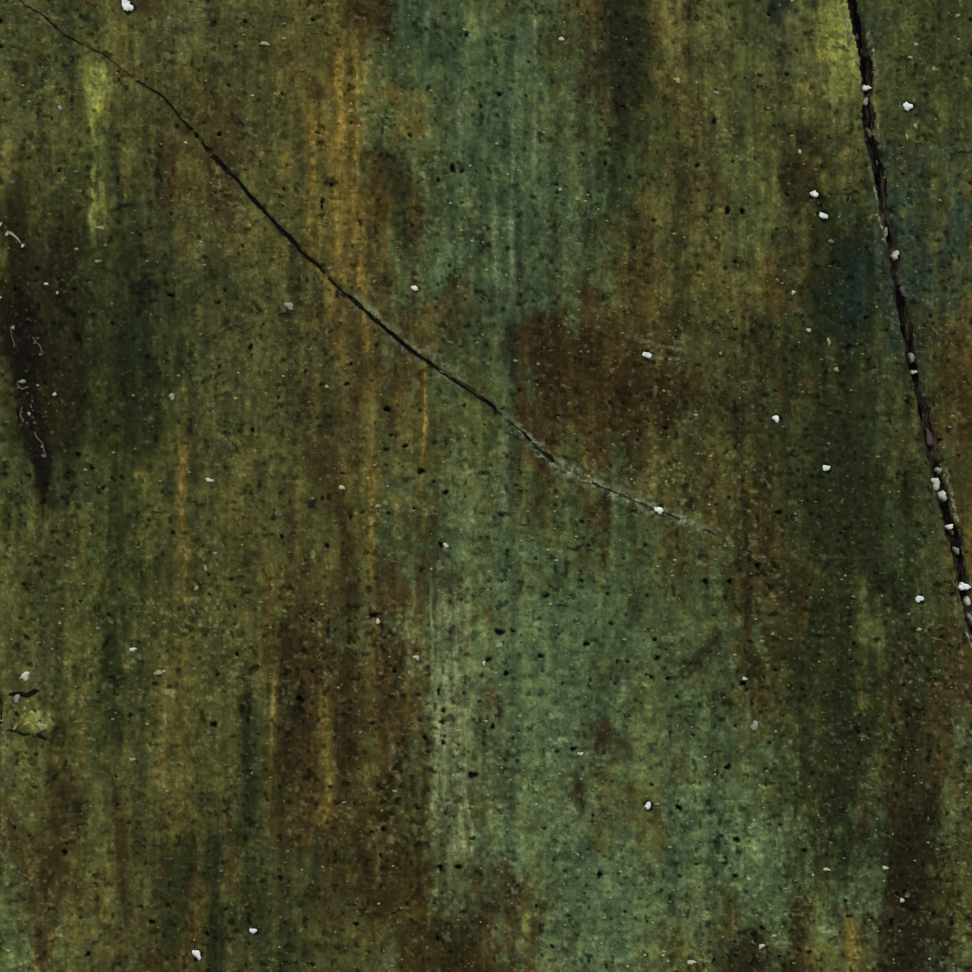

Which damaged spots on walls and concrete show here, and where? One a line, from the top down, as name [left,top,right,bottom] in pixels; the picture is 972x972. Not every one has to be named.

water stain [771,0,788,23]
water stain [0,115,165,742]
corrosion [176,444,190,605]
crack [19,0,716,535]
corrosion [365,415,377,597]
corrosion [510,323,702,443]
water stain [778,124,952,972]
crack [845,0,972,648]
corrosion [269,665,277,769]
corrosion [320,695,332,818]
corrosion [357,827,503,972]
water stain [727,913,811,972]